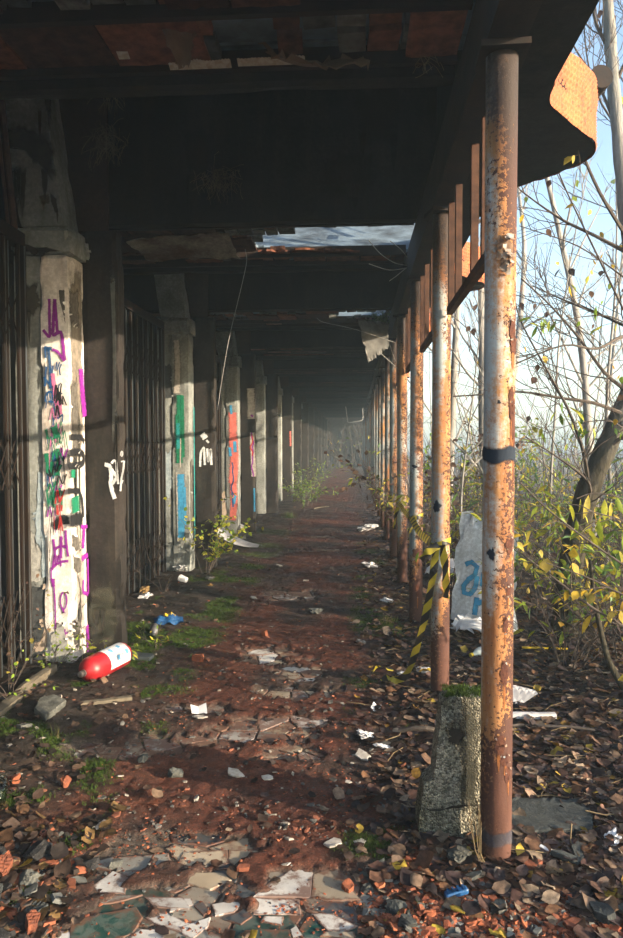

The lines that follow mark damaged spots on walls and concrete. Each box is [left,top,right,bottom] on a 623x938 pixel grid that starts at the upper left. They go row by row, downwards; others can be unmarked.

rust [510,319,518,371]
rust [503,584,512,644]
rust [500,661,509,710]
rust [494,735,512,795]
peeling [323,837,342,848]